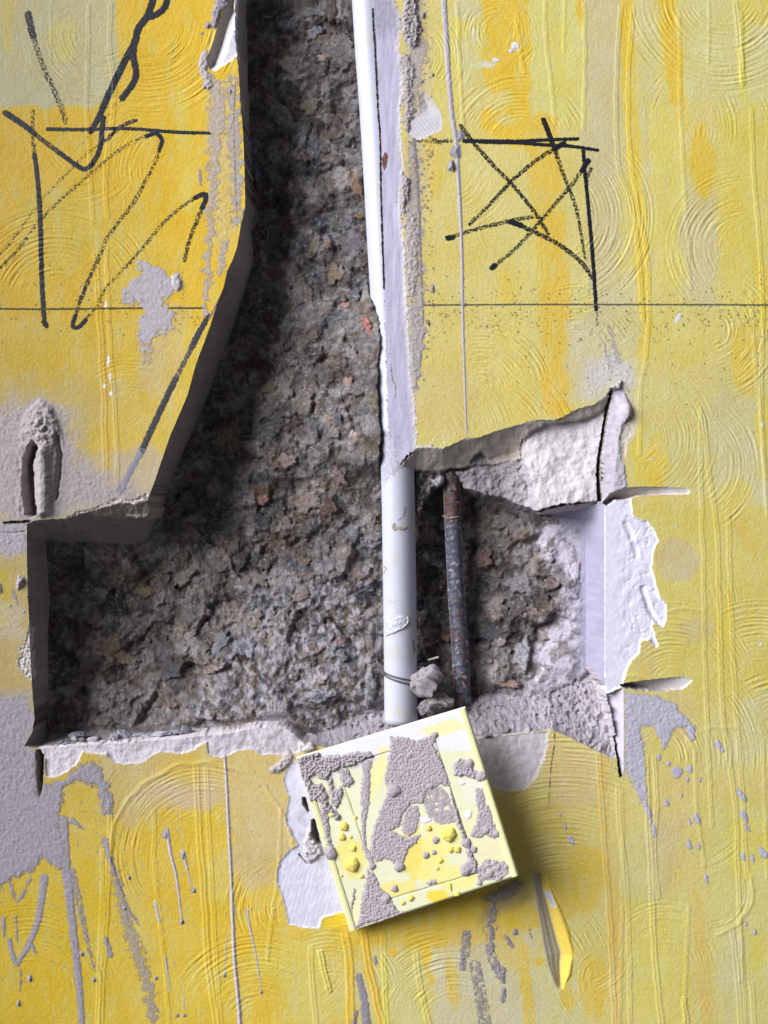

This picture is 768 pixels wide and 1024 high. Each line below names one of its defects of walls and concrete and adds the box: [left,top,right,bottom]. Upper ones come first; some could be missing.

spalling [208,0,240,71]
peeling [171,274,183,292]
spalling [373,0,668,710]
crack [595,389,612,502]
spalling [66,492,166,521]
spalling [16,626,37,681]
peeling [475,729,550,793]
peeling [37,721,344,929]